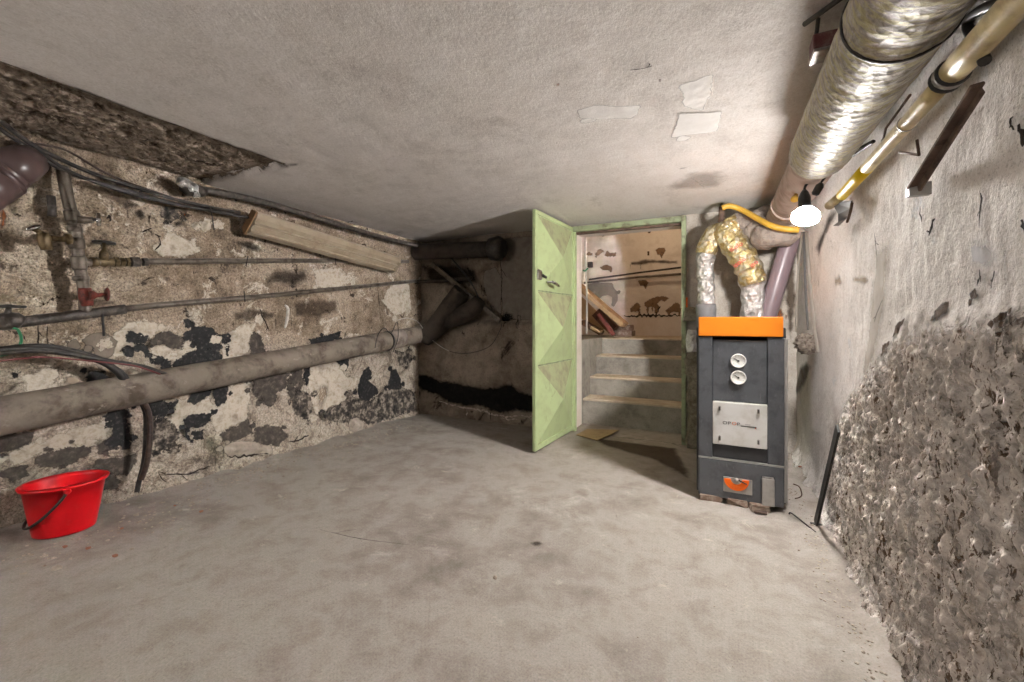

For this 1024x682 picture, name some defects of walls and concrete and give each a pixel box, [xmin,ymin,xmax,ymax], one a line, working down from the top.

spalling [0,61,284,181]
peeling [152,214,225,258]
peeling [312,267,356,289]
peeling [382,283,411,322]
peeling [82,318,197,364]
peeling [210,313,268,359]
peeling [21,359,59,392]
peeling [152,362,372,458]
peeling [0,420,138,491]
flaking render [827,302,1024,682]